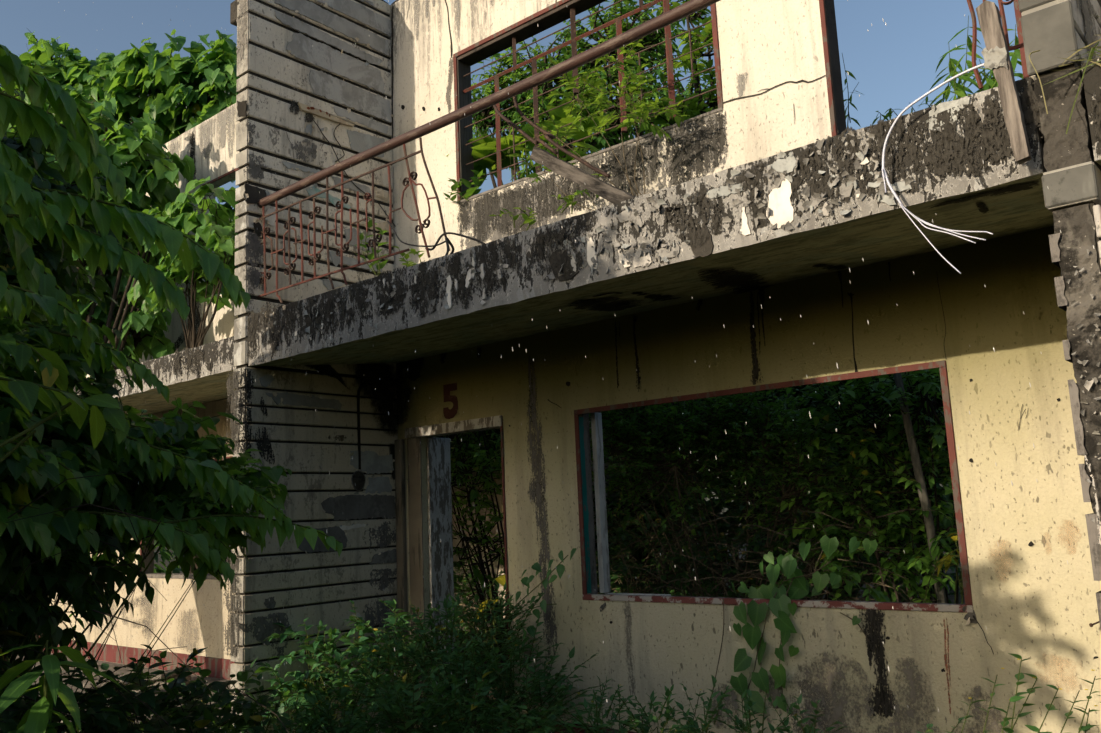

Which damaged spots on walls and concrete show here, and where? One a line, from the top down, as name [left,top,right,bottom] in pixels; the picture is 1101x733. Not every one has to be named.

water stain [236,0,249,61]
water stain [289,100,315,123]
water stain [737,72,747,97]
crack [723,75,826,123]
peeling [926,97,970,132]
spalling [243,183,276,237]
water stain [574,111,728,263]
peeling [547,130,914,281]
peeling [263,228,510,351]
water stain [226,171,612,480]
spalling [1053,204,1101,540]
water stain [526,357,557,657]